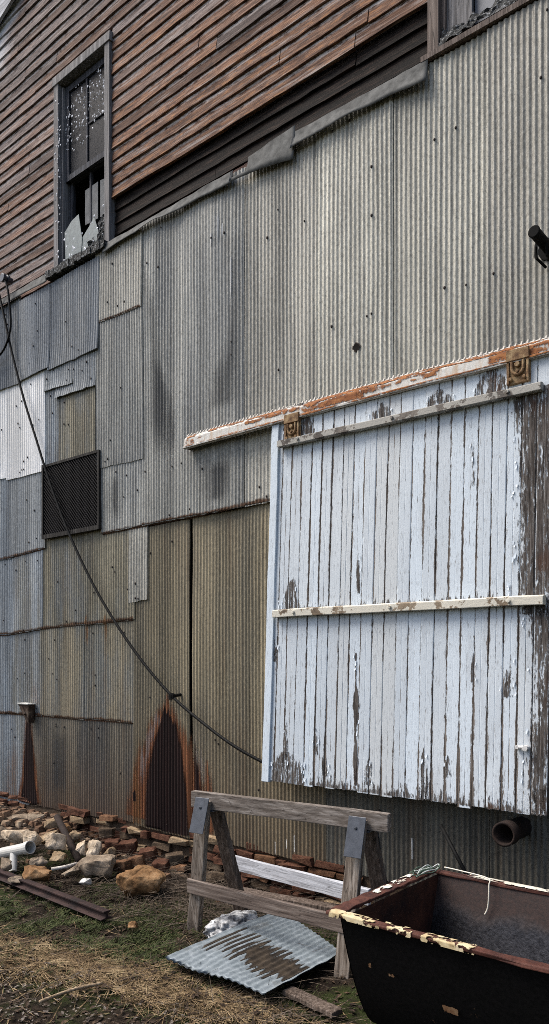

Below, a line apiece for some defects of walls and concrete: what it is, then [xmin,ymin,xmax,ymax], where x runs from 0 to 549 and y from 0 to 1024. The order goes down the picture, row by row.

corrosion [186,339,549,446]
peeling [269,369,549,816]
corrosion [0,711,132,805]
corrosion [127,696,212,836]